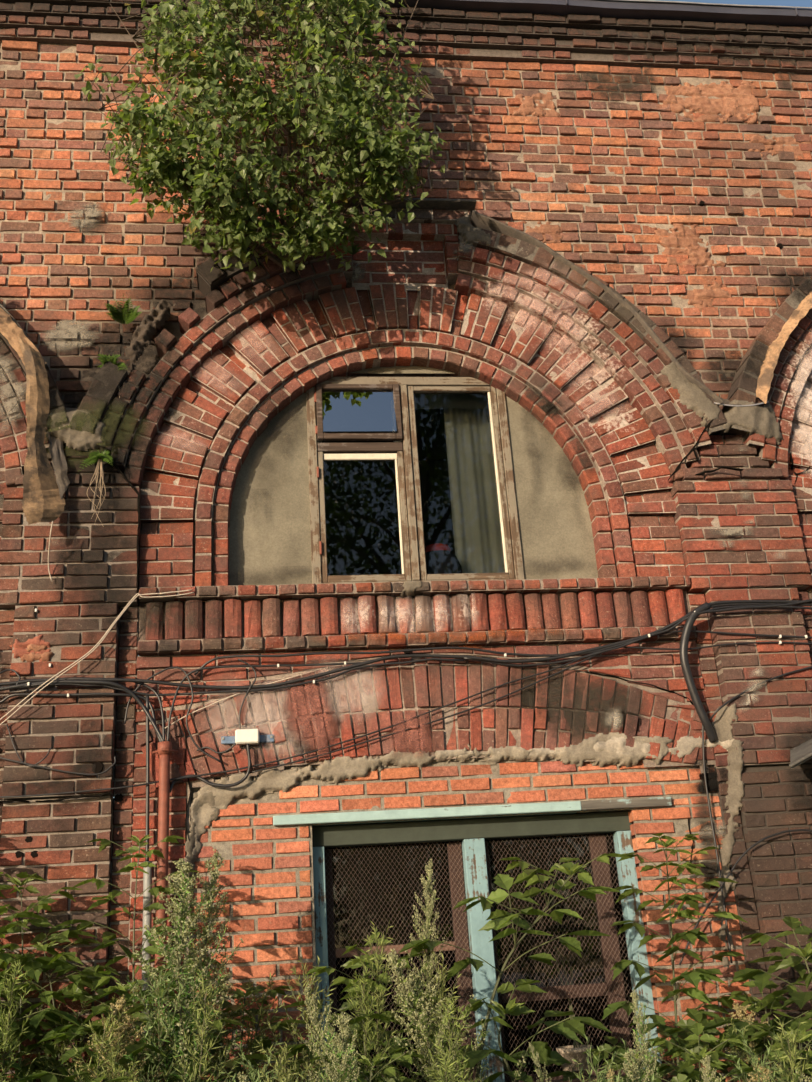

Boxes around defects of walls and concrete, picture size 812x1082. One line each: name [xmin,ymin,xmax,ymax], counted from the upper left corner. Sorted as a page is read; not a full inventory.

crack [668,419,744,481]
crack [790,453,811,485]
spalling [396,719,427,753]